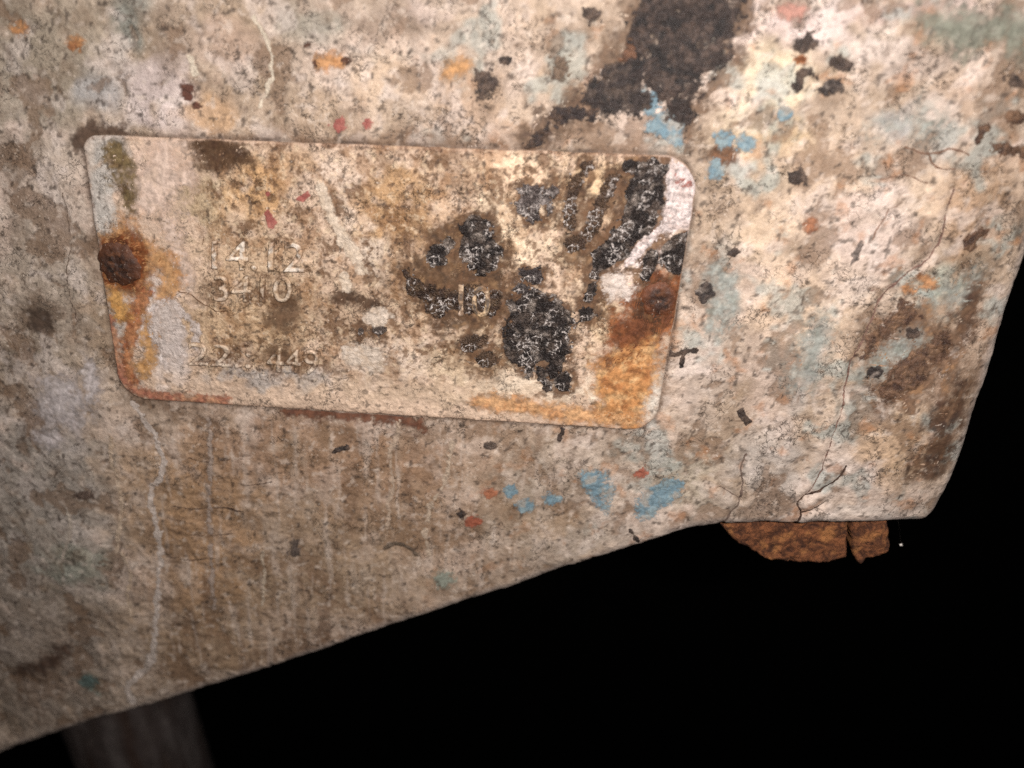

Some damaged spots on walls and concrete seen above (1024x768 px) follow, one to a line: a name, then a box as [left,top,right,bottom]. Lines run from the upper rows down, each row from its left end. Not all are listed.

rust [98,217,231,404]
rust [471,269,681,429]
crack [795,146,970,522]
crack [719,453,747,522]